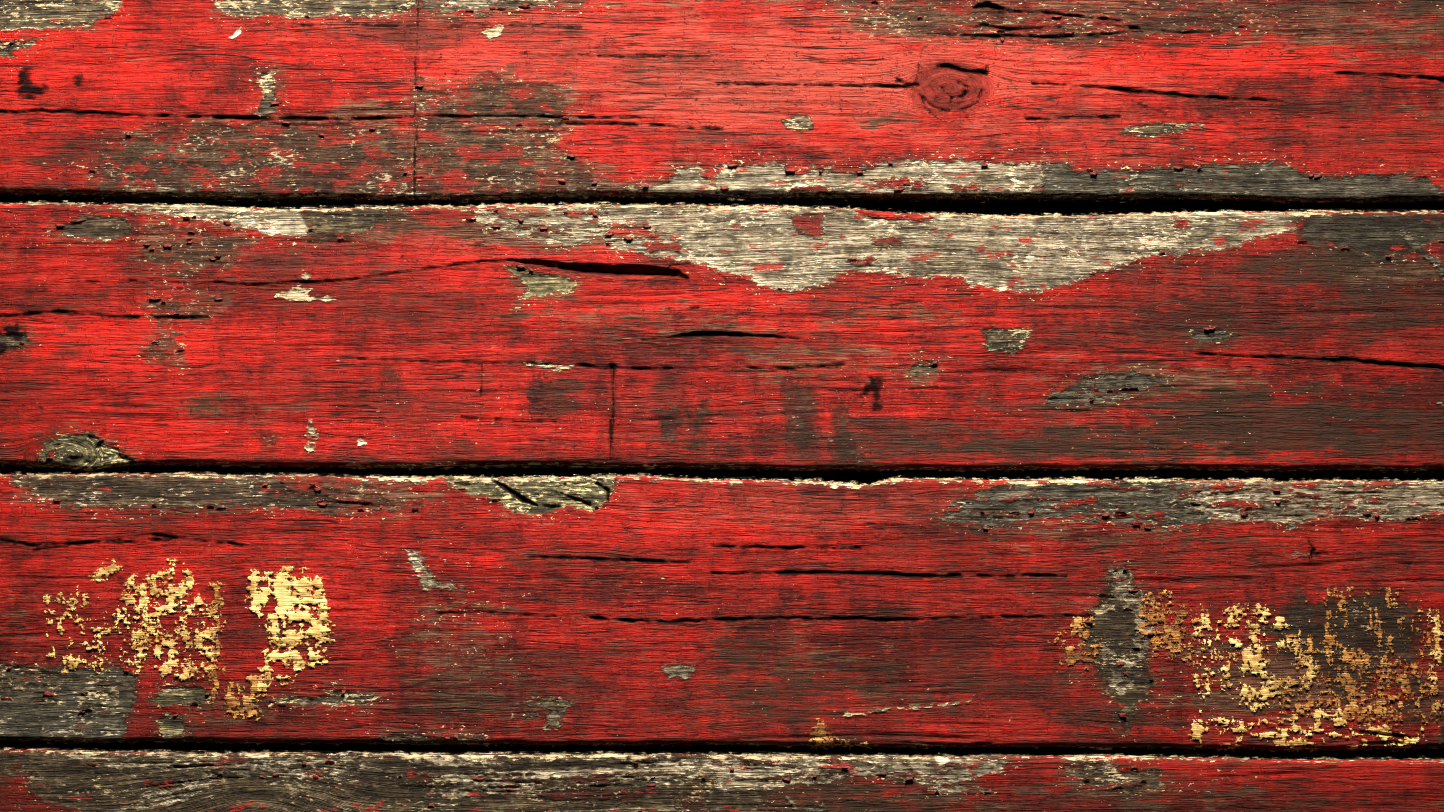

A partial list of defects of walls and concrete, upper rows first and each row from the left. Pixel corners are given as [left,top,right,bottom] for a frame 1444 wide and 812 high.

peeling [0,0,122,58]
peeling [214,0,555,40]
peeling [55,70,1444,294]
peeling [274,270,337,302]
crack [0,258,844,506]
peeling [9,430,423,516]
spalling [445,478,618,515]
peeling [938,480,1444,535]
peeling [1080,566,1154,733]
peeling [1357,587,1437,688]
peeling [0,621,1007,812]
peeling [1326,716,1444,752]